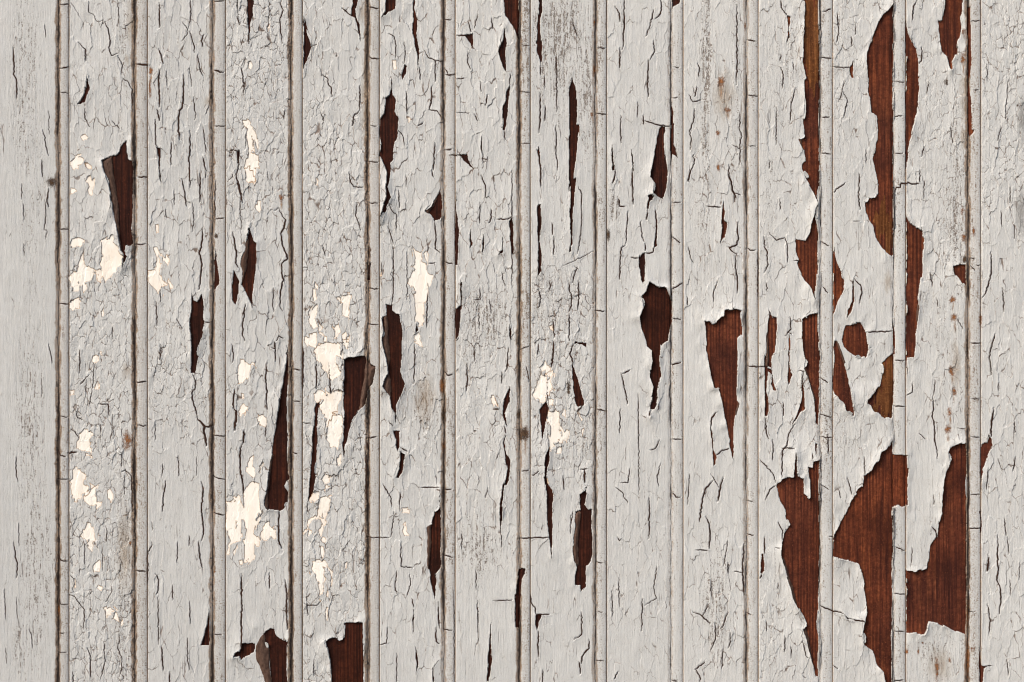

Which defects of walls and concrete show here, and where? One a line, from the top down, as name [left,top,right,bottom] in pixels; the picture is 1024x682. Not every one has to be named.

crack [21,0,283,289]
crack [349,151,513,390]
crack [597,0,701,203]
peeling [639,107,678,413]
crack [708,1,799,336]
peeling [795,0,820,298]
peeling [865,5,919,256]
crack [137,336,331,682]
crack [574,370,808,682]
peeling [776,443,820,676]
peeling [832,442,908,682]
peeling [905,443,967,634]